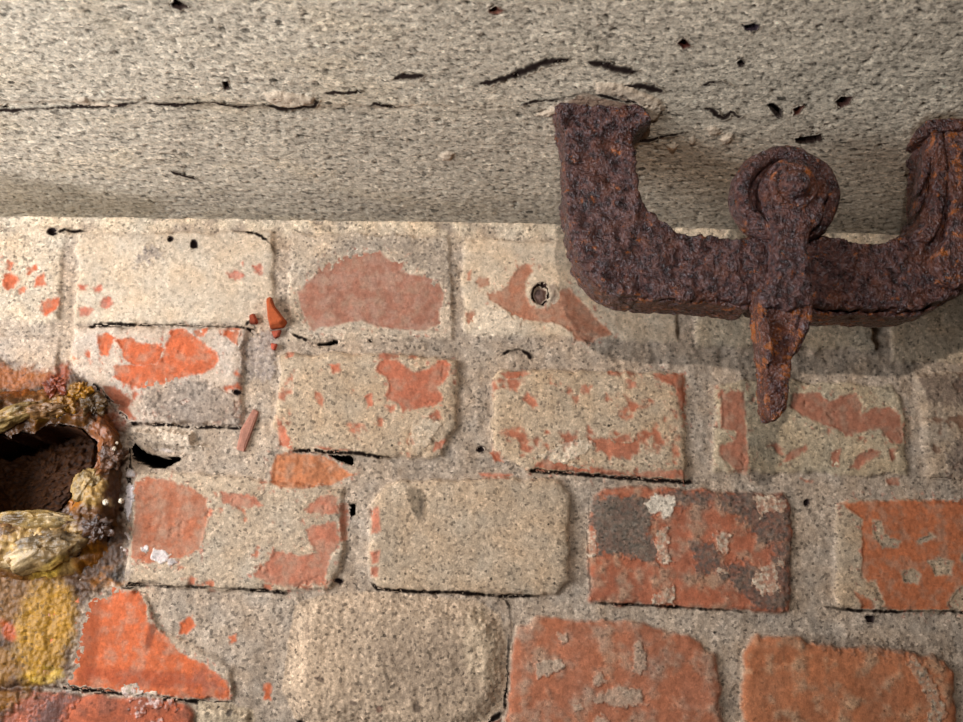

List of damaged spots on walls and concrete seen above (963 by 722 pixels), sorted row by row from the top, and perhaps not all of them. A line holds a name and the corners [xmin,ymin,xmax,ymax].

crack [0,89,394,114]
crack [390,72,426,82]
crack [475,56,690,144]
corrosion [546,89,636,138]
crack [700,80,746,121]
corrosion [901,101,963,145]
corrosion [909,131,963,291]
corrosion [752,304,774,368]
water stain [70,467,101,502]
water stain [0,509,89,576]
corrosion [0,349,135,722]